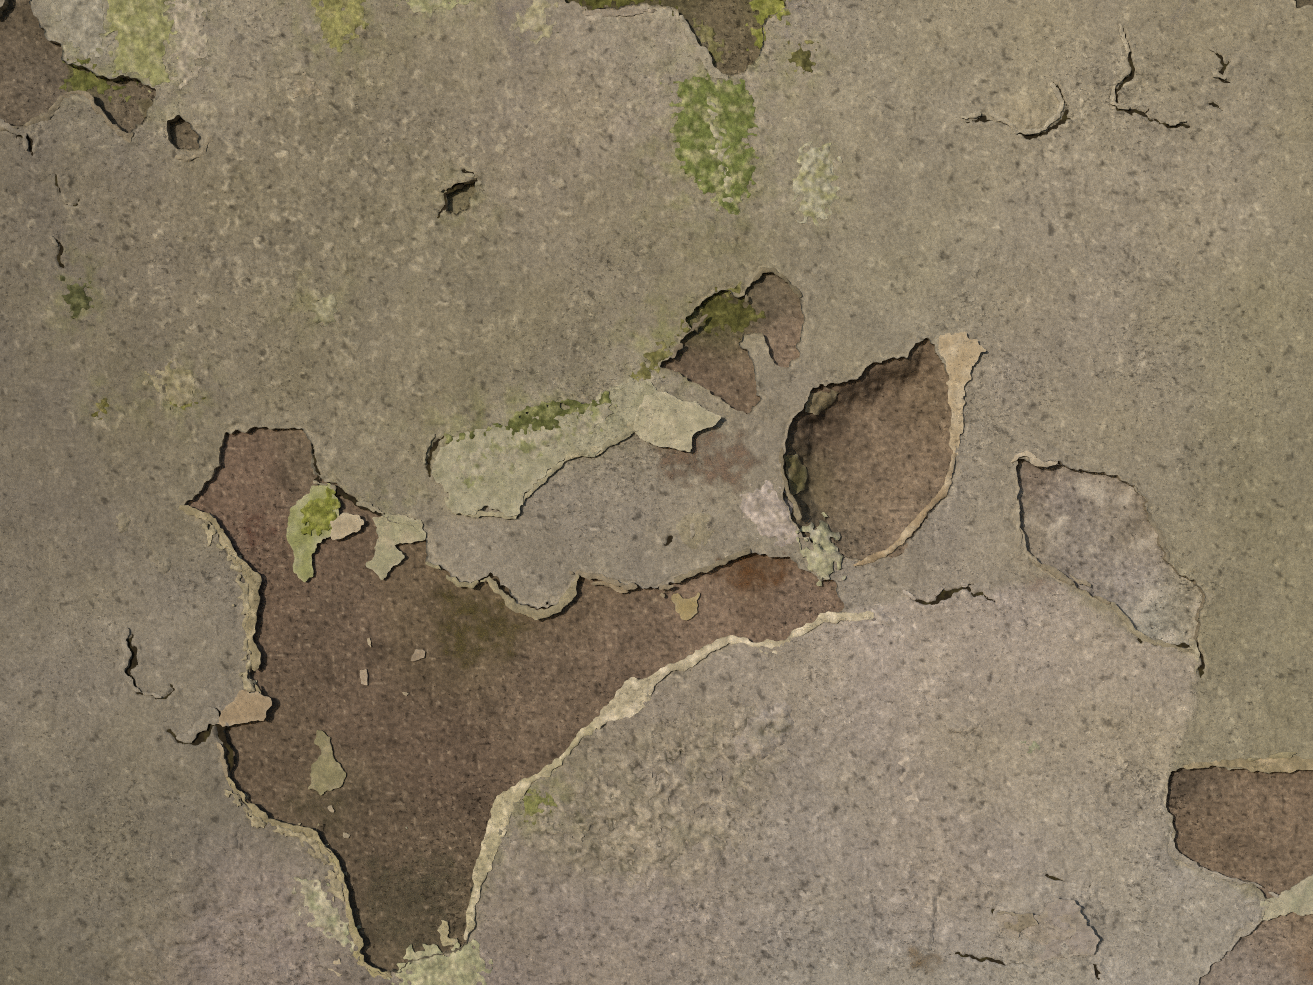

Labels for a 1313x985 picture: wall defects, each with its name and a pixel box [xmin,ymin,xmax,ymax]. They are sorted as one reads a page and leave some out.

peeling [0,0,156,143]
peeling [565,0,766,80]
crack [961,82,1071,140]
crack [1109,23,1230,129]
spalling [1294,0,1313,8]
peeling [432,267,804,519]
spalling [779,332,986,566]
peeling [1011,450,1202,653]
crack [119,628,234,771]
peeling [179,427,913,979]
peeling [997,898,1100,963]
peeling [1166,751,1313,985]